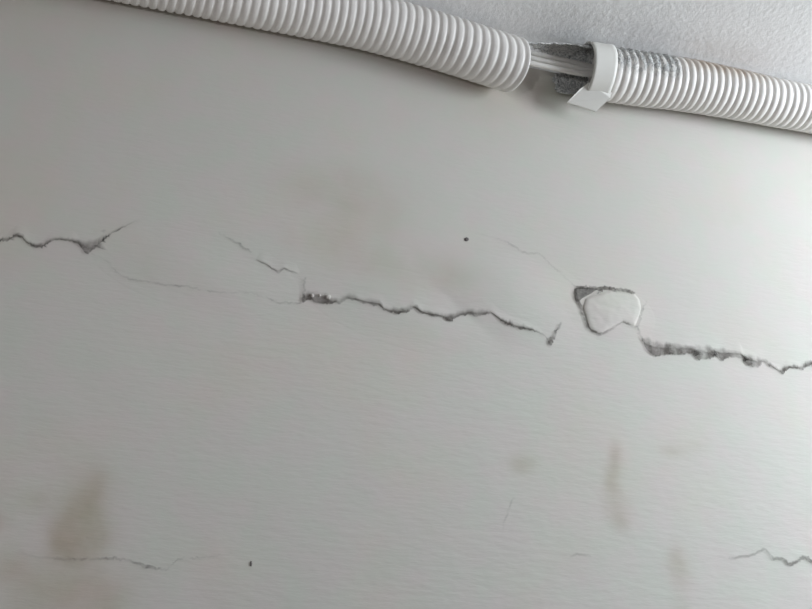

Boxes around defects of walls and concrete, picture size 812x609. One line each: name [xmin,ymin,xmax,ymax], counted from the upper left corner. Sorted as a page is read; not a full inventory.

crack [0,224,119,253]
crack [302,289,557,345]
flaking render [574,286,641,334]
crack [642,336,812,374]